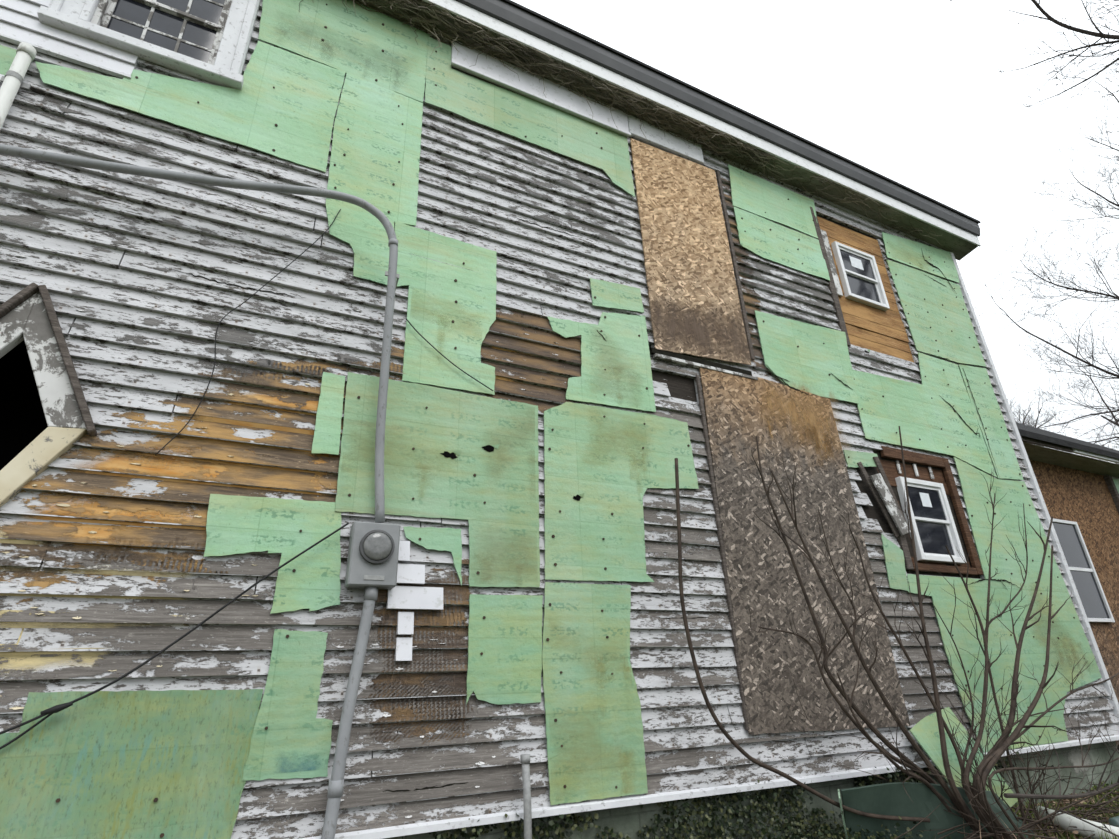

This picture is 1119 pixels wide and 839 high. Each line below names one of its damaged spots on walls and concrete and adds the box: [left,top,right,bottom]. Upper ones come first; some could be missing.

peeling [0,85,550,839]
peeling [421,117,640,253]
peeling [481,258,589,413]
peeling [650,356,699,380]
peeling [721,178,840,377]
peeling [629,396,858,795]